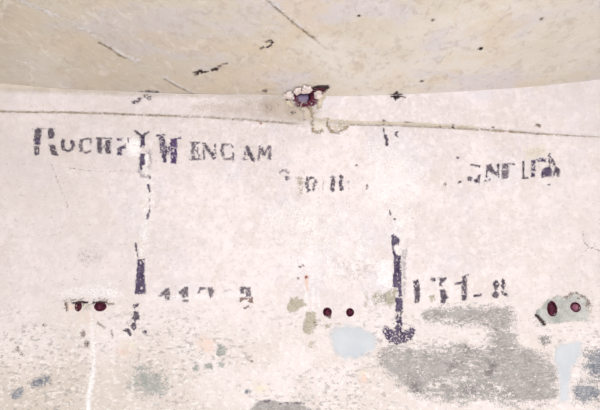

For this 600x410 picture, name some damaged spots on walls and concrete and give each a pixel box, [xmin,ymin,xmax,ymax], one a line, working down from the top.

crack [16,0,195,94]
crack [267,0,329,50]
spalling [280,85,349,134]